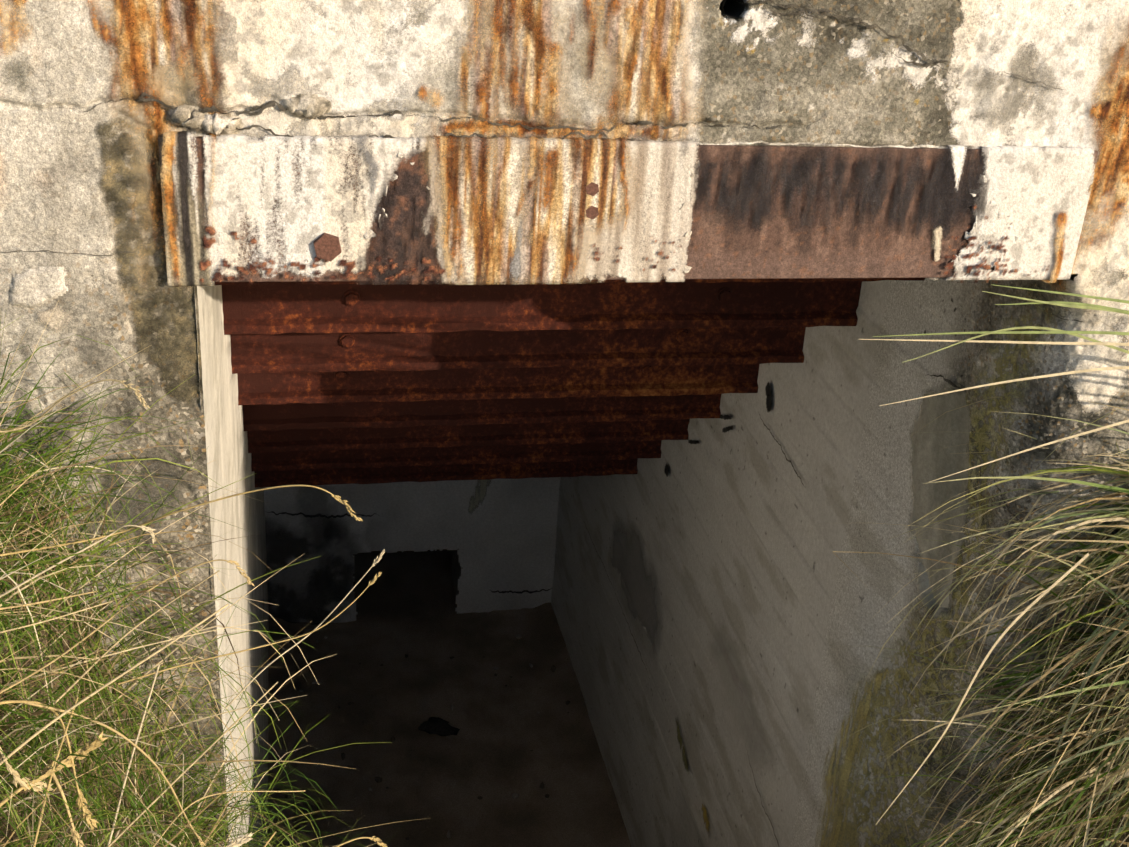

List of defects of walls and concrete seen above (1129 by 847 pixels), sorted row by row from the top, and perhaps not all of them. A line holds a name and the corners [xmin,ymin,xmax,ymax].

leakage [97,118,202,404]
crack [69,92,294,137]
peeling [195,0,500,284]
rust [88,0,686,286]
peeling [515,137,548,220]
crack [319,110,815,141]
peeling [564,139,701,283]
rust [943,41,1129,290]